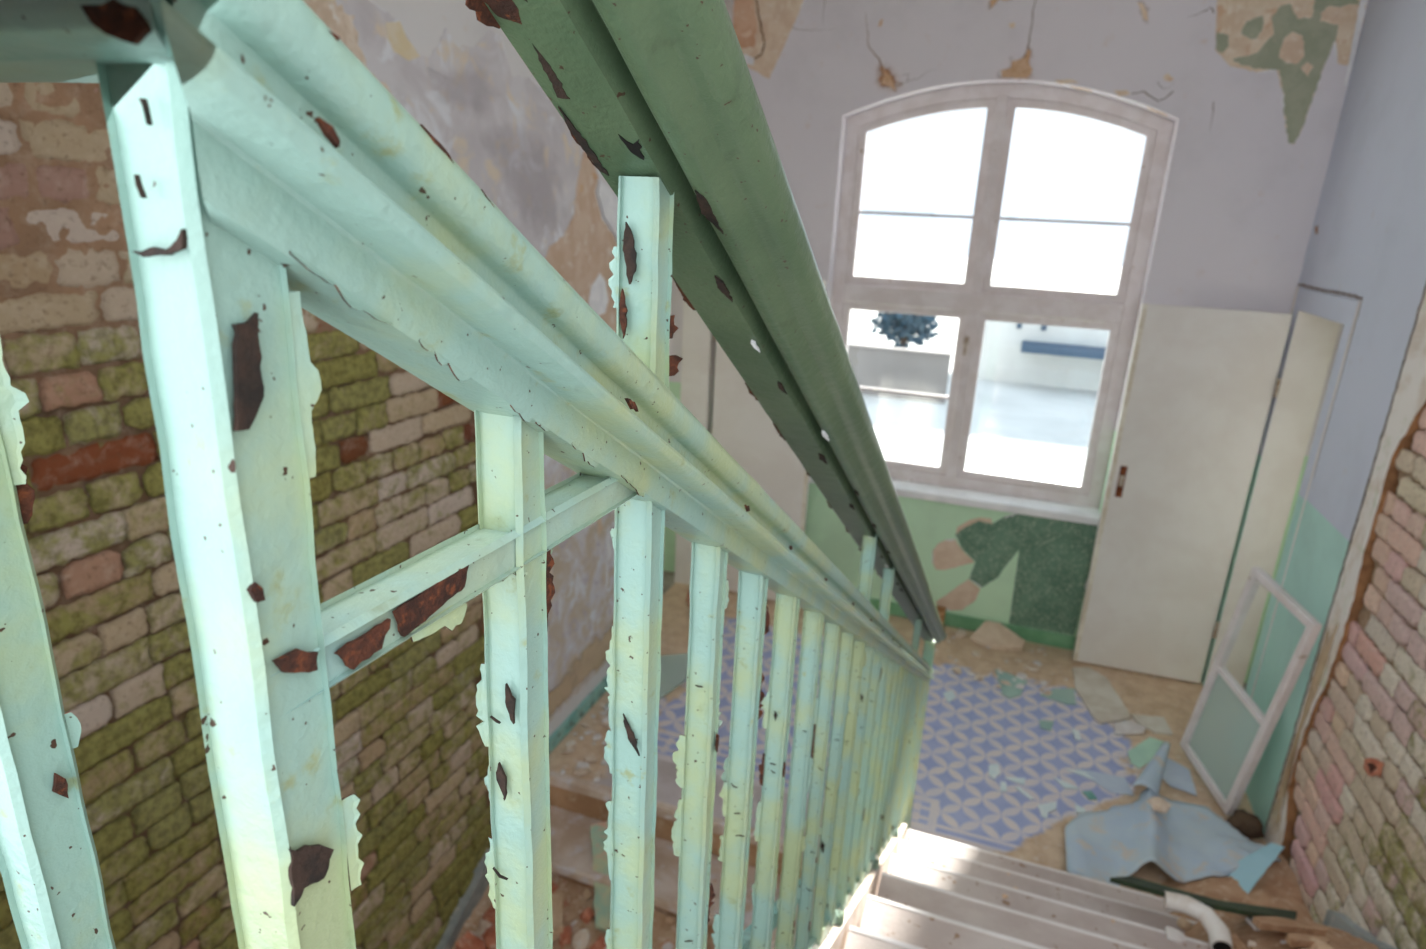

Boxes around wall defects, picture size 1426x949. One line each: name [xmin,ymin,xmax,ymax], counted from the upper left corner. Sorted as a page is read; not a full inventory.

rust [482,0,528,24]
flaking render [732,0,804,79]
crack [865,12,935,91]
flaking render [1189,0,1367,144]
peeling [289,0,618,333]
flaking render [0,82,239,949]
rust [272,565,469,673]
flaking render [289,291,478,604]
flaking render [932,514,1098,635]
flaking render [1288,408,1426,949]
flaking render [330,593,495,949]
rust [288,844,334,907]